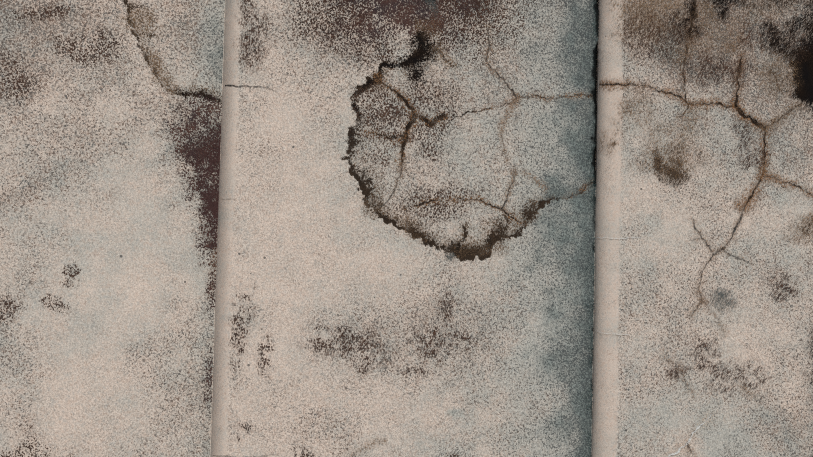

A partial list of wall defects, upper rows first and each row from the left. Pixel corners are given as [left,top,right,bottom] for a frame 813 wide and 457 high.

crack [122,0,274,104]
damp [611,0,813,117]
damp [342,20,559,261]
crack [364,0,813,332]
damp [733,119,772,170]
damp [585,0,654,457]
damp [765,267,800,302]
damp [668,334,770,399]